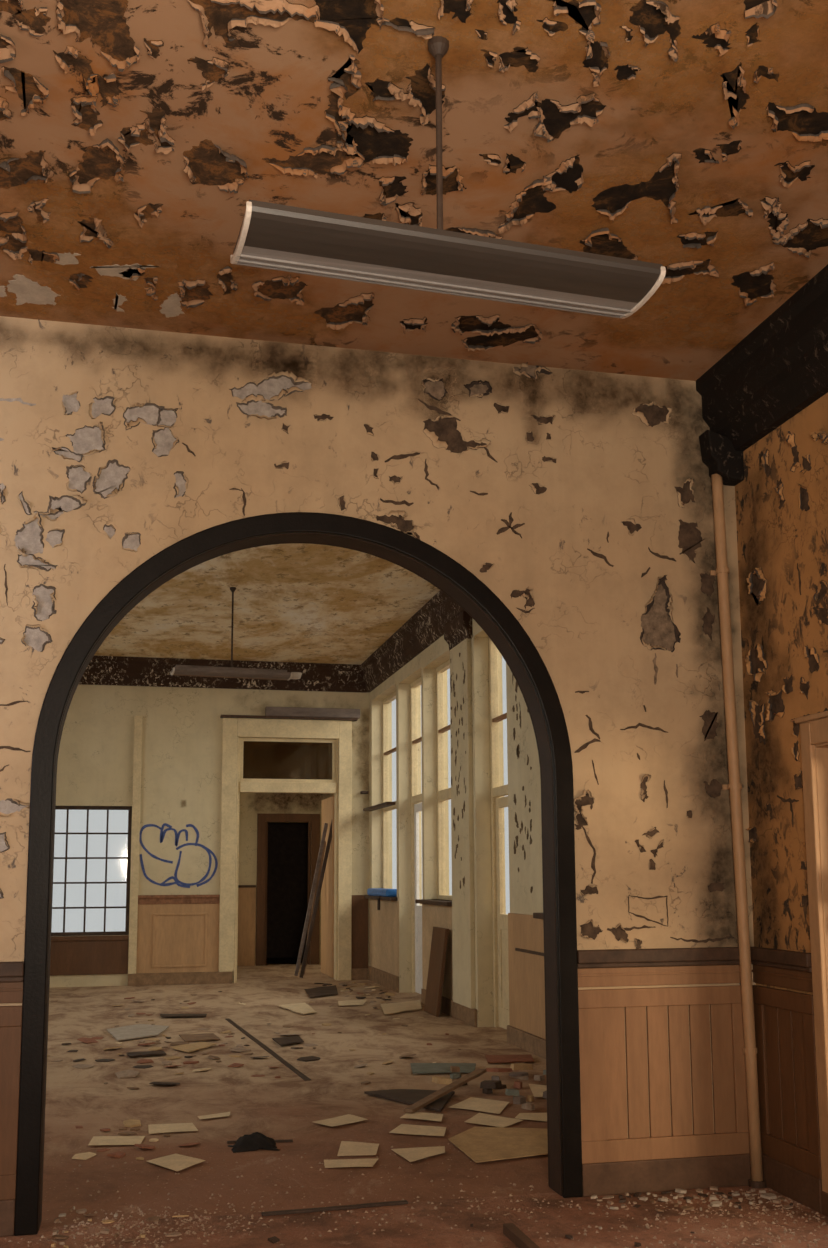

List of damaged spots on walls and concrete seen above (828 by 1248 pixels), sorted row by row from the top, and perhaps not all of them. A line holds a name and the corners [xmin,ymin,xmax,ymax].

peeling [0,0,249,194]
peeling [187,0,540,227]
peeling [504,0,641,142]
peeling [620,0,777,62]
peeling [446,153,584,239]
peeling [580,62,828,306]
leakage [182,345,311,377]
peeling [178,266,374,330]
peeling [451,315,543,352]
leakage [564,371,678,424]
peeling [640,575,681,685]
peeling [574,760,599,896]